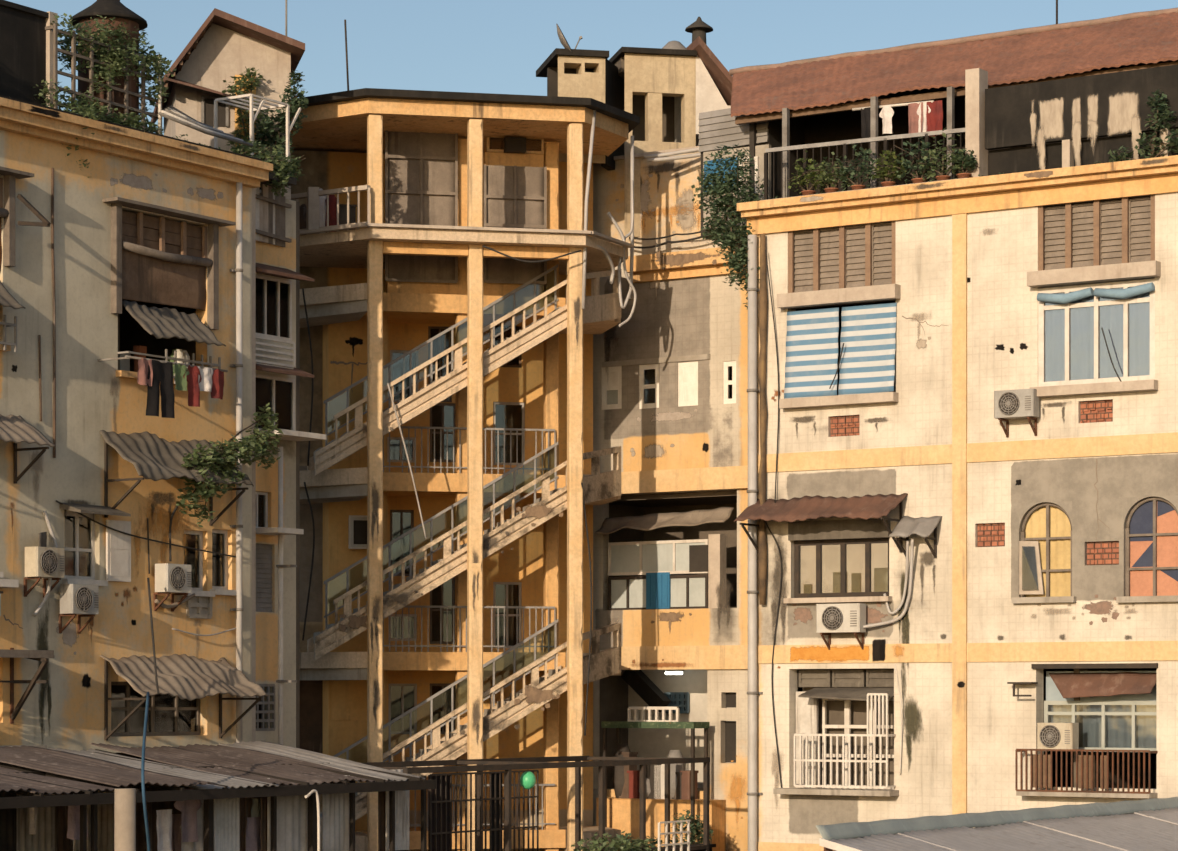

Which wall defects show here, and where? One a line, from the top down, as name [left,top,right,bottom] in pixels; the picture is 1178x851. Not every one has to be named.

peeling [1030,93,1141,170]
water stain [640,163,683,195]
water stain [898,552,935,644]
water stain [37,615,52,742]
water stain [902,662,922,762]